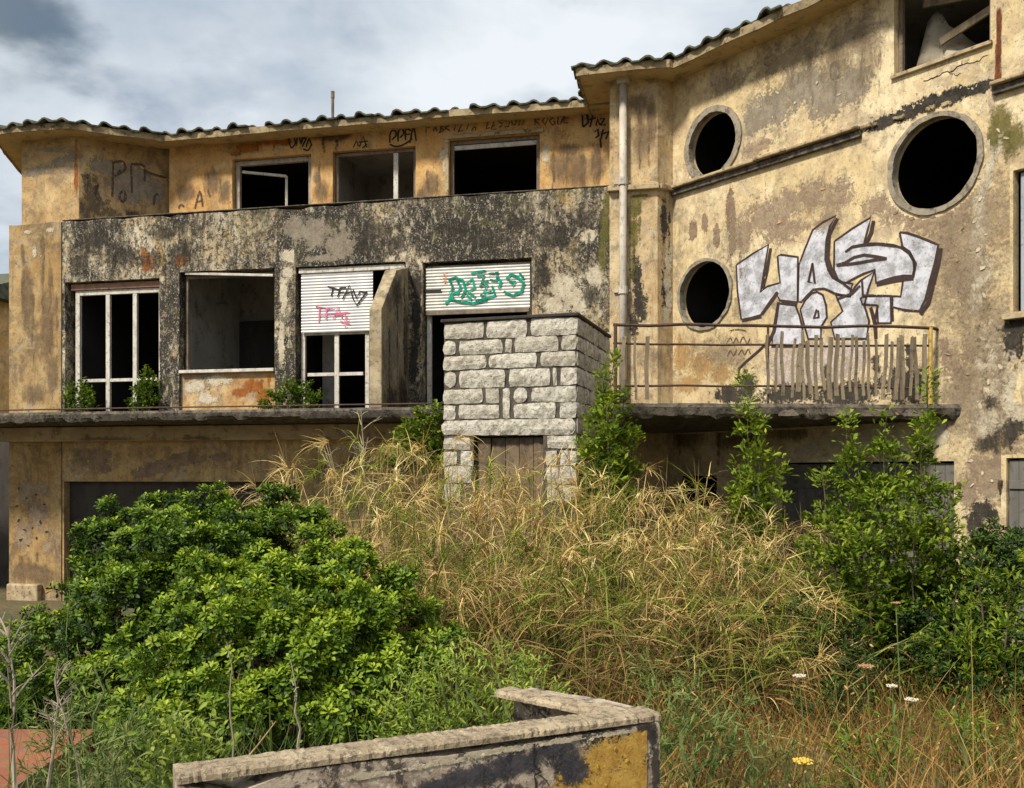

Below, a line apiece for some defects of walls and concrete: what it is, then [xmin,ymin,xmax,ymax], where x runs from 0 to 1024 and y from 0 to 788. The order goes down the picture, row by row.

crack [924,55,987,81]
spalling [860,79,1002,133]
leakage [66,173,194,274]
leakage [284,213,411,264]
leakage [629,199,671,341]
peeling [688,125,1024,511]
leakage [695,114,1024,555]
peeling [182,374,234,405]
leakage [674,429,807,462]
peeling [328,730,647,788]